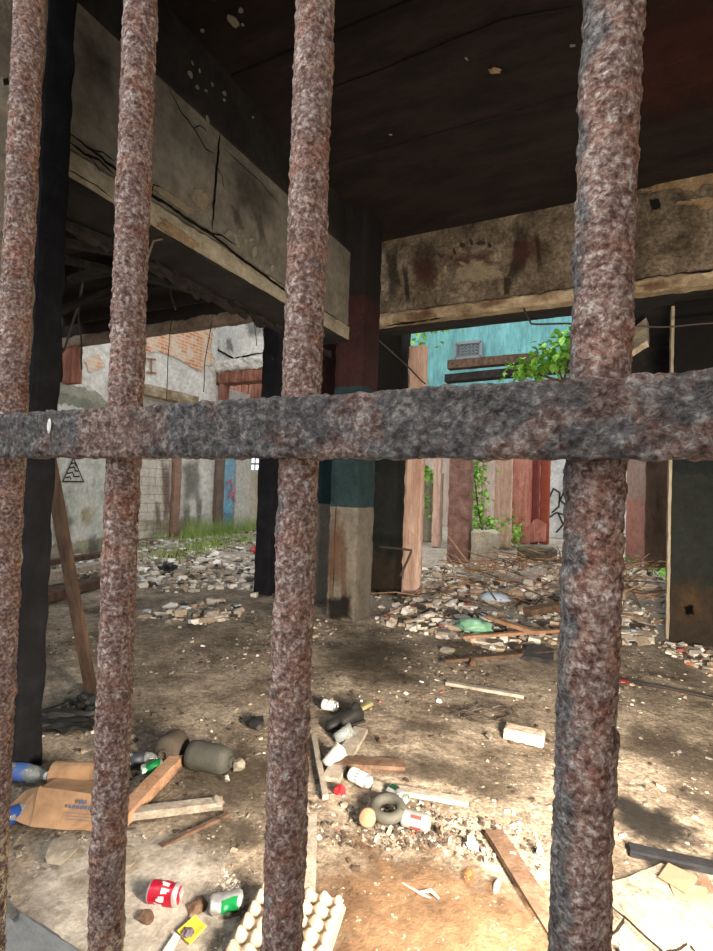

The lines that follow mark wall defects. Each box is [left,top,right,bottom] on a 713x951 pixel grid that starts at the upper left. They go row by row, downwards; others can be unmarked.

peeling [227,7,244,28]
crack [69,134,116,196]
crack [151,89,286,291]
rust [156,463,170,522]
rust [329,526,346,597]
crack [612,906,695,951]